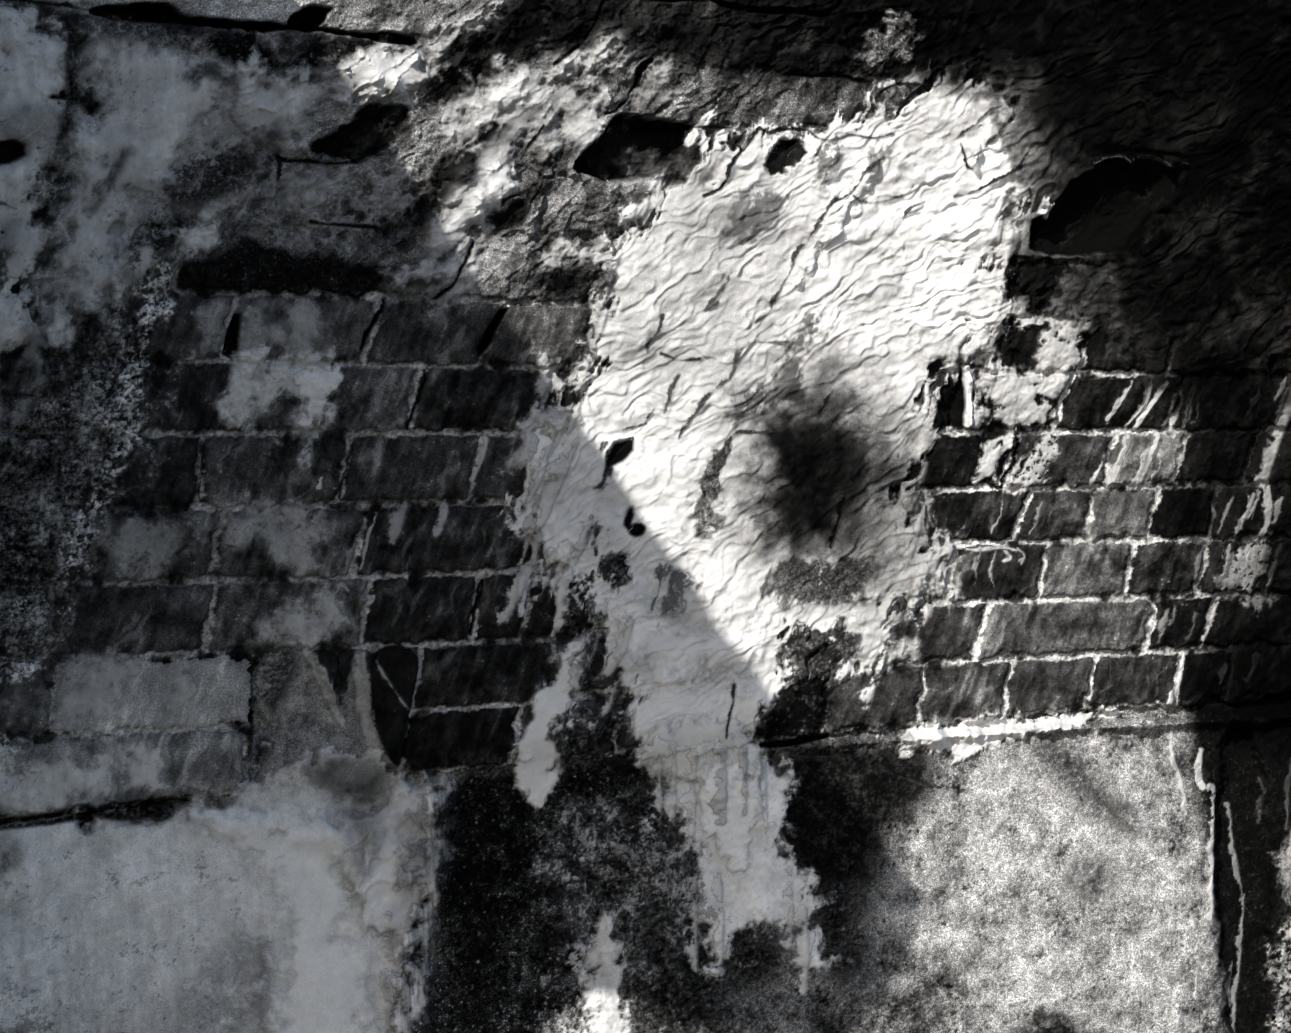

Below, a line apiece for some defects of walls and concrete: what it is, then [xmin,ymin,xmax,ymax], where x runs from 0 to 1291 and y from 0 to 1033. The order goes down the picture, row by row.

crack [605,58,653,115]
crack [792,72,935,99]
flaking render [0,6,254,360]
spalling [573,114,690,182]
crack [623,105,1039,437]
crack [717,429,773,457]
spalling [932,371,965,428]
leakage [1089,381,1199,489]
leakage [379,68,1141,1033]
spalling [546,523,632,769]
leakage [1157,607,1176,643]
spalling [187,644,418,834]